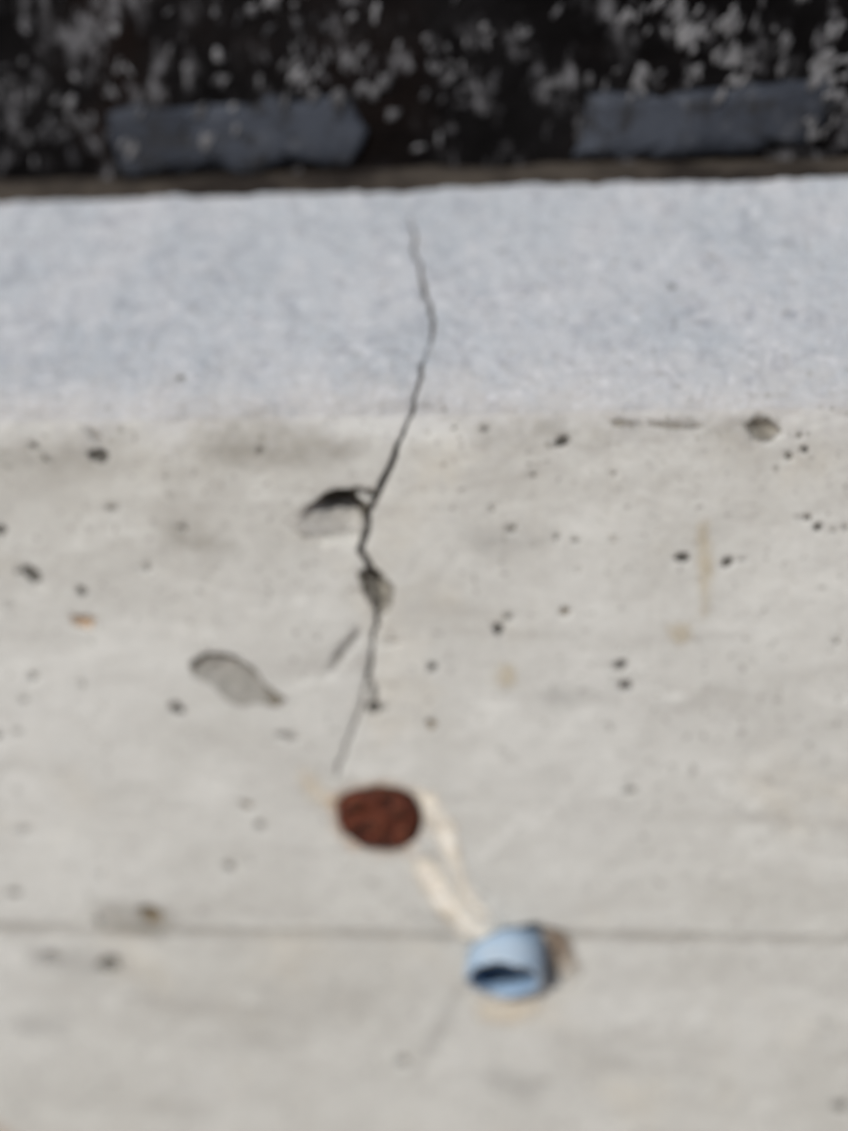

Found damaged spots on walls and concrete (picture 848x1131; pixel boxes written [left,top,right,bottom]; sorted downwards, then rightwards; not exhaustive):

crack [352,216,436,569]
spalling [286,489,369,536]
spalling [190,652,285,706]
crack [332,608,380,779]
corrosion [338,786,493,942]